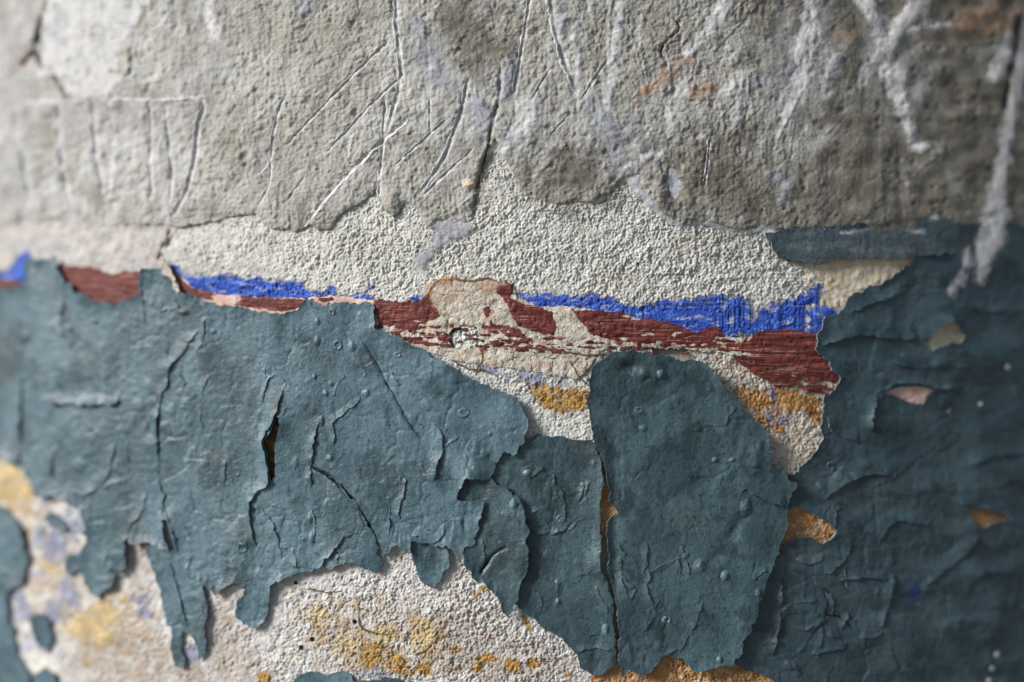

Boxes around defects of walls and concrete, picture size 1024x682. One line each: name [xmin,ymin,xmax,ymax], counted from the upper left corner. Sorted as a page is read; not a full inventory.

crack [472,64,501,216]
spalling [928,321,965,351]
spalling [0,139,958,682]
crack [311,463,374,533]
spalling [967,509,1010,529]